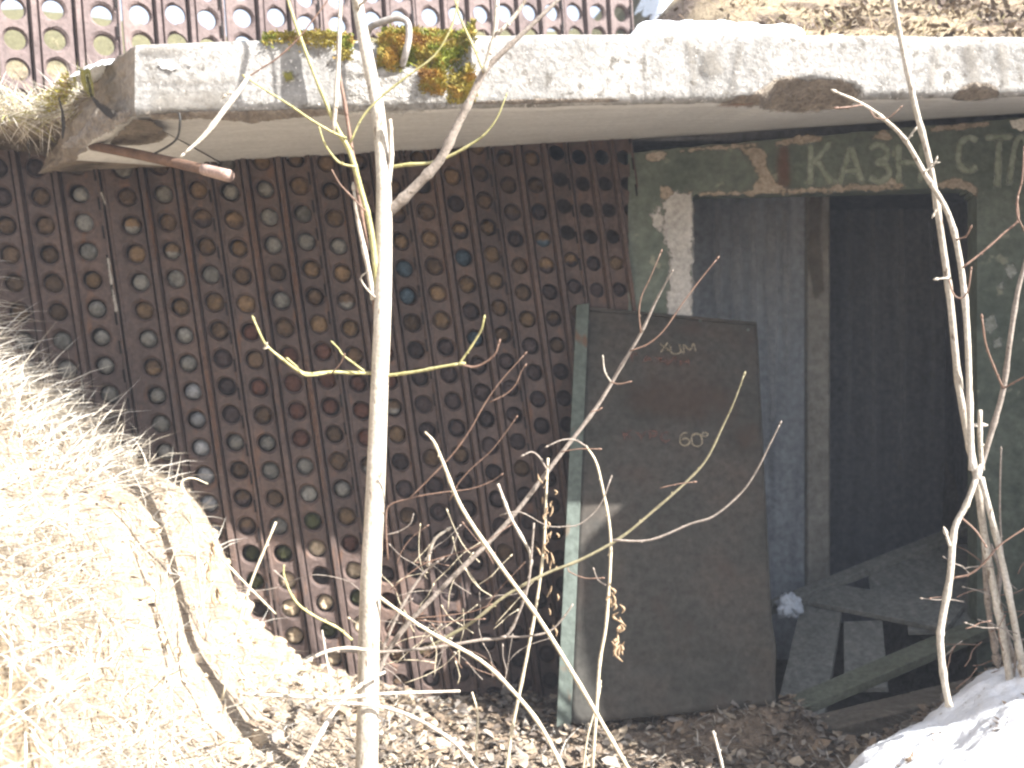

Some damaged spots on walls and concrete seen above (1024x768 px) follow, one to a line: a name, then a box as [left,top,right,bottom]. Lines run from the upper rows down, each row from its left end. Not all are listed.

spalling [61,37,480,150]
spalling [721,76,861,113]
spalling [952,82,999,101]
peeling [929,121,989,132]
peeling [645,151,667,162]
peeling [937,177,978,196]
peeling [649,134,906,316]